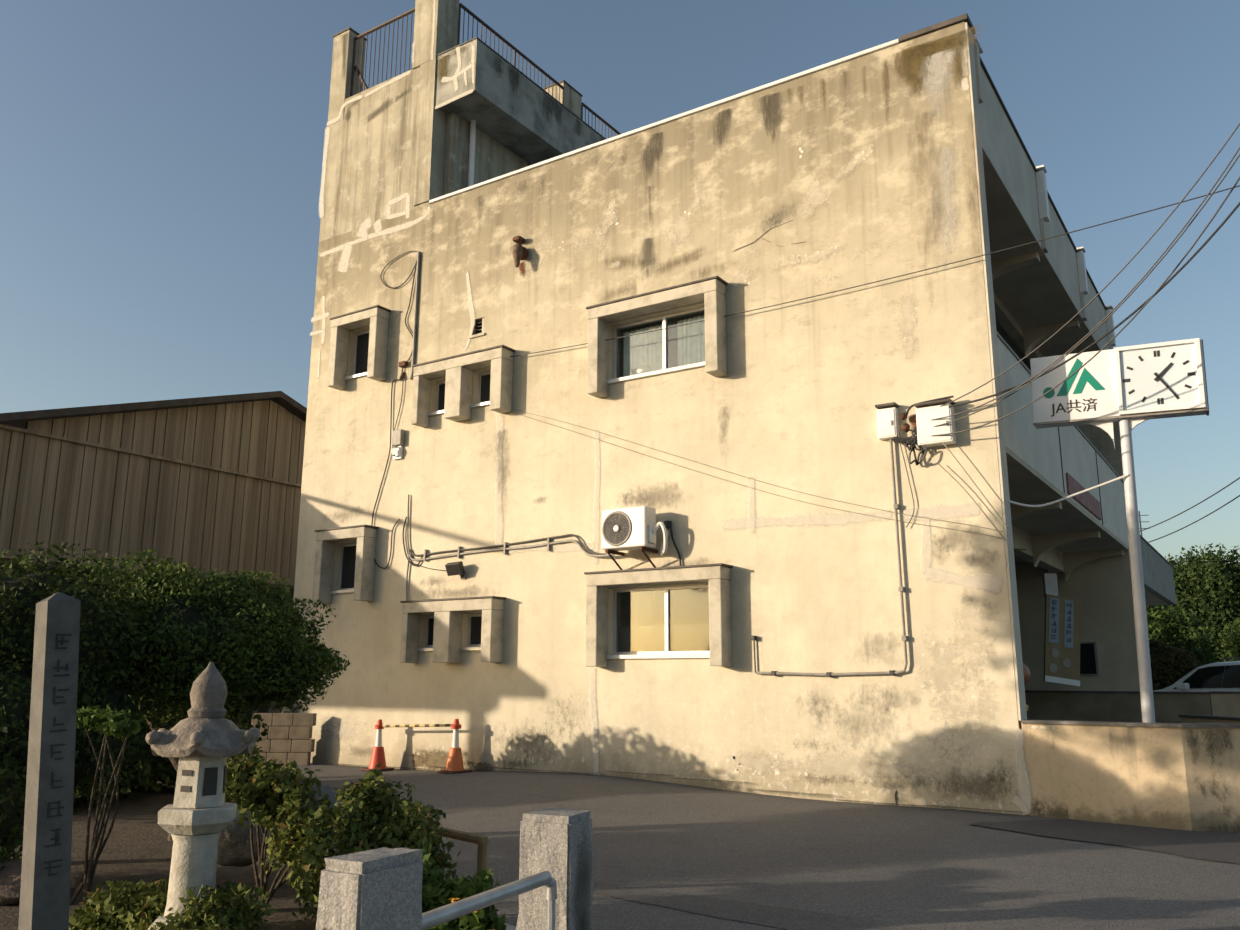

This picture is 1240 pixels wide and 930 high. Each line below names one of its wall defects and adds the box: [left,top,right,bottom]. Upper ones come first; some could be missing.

leakage [884,26,975,97]
leakage [717,109,729,141]
leakage [763,93,780,134]
leakage [644,133,662,171]
leakage [642,238,654,267]